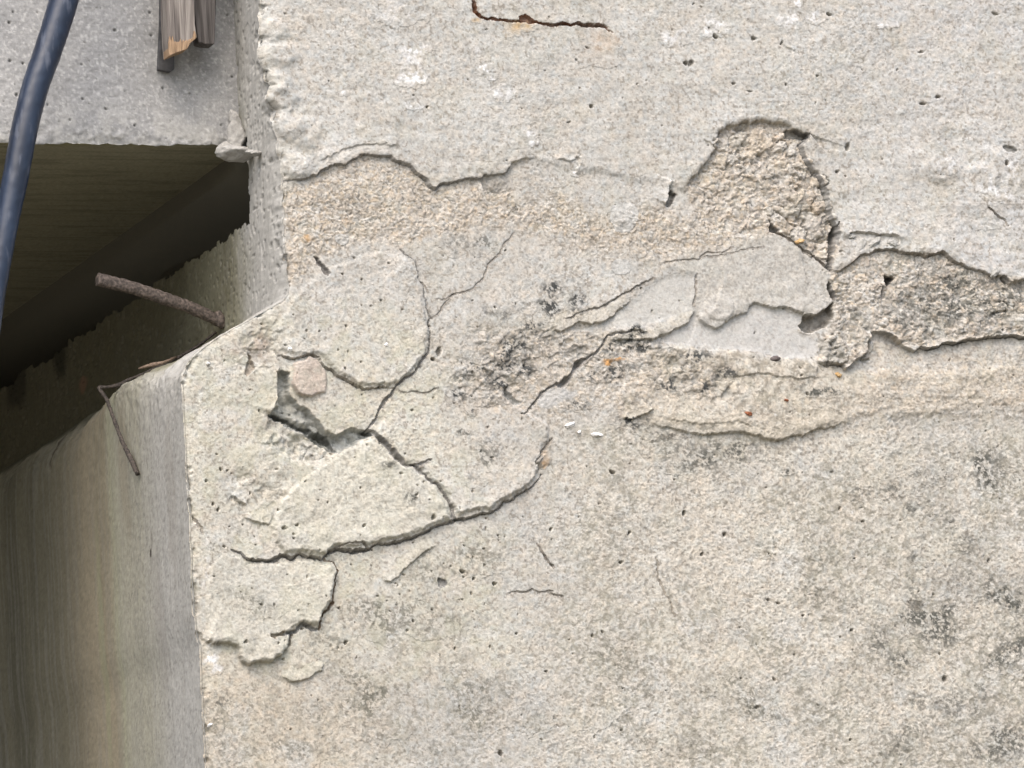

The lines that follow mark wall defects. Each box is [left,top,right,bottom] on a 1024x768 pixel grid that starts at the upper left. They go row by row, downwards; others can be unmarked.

crack [472,0,606,29]
spalling [286,121,1024,367]
crack [230,232,553,647]
spalling [537,388,575,409]
flaking render [624,406,852,441]
crack [506,543,564,598]